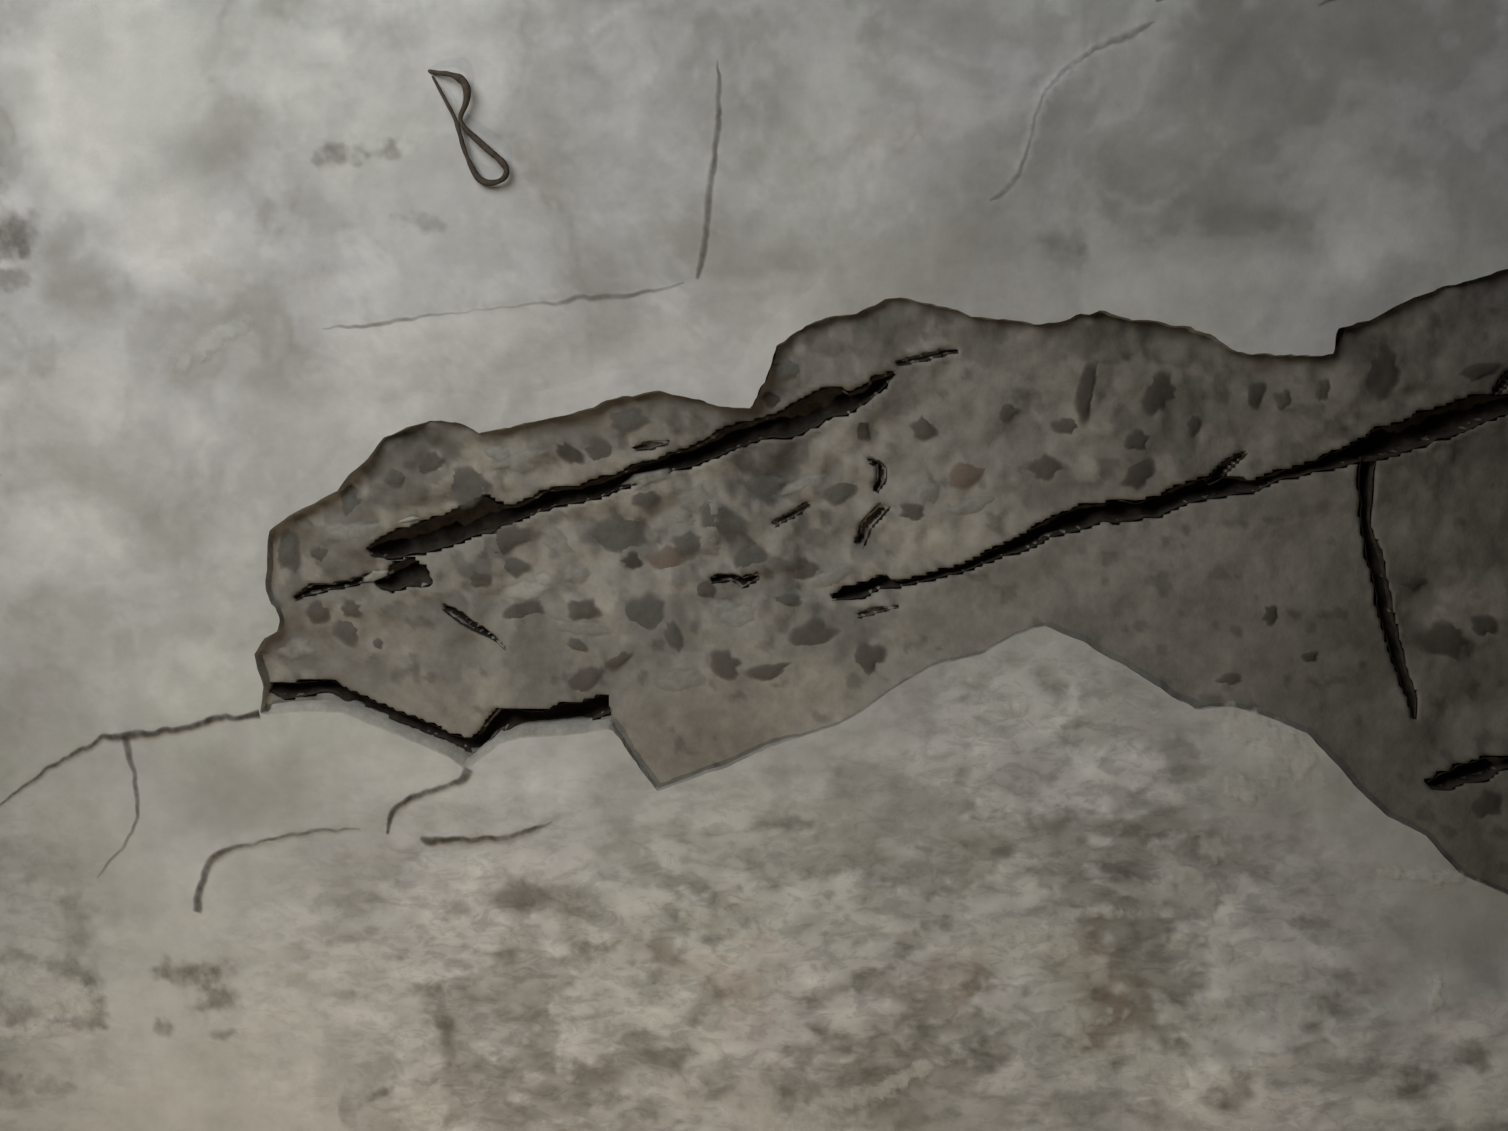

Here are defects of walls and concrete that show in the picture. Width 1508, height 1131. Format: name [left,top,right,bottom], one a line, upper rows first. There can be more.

crack [293,349,958,650]
crack [832,372,1508,718]
crack [0,679,611,845]
crack [1426,755,1508,790]
crack [195,838,277,912]